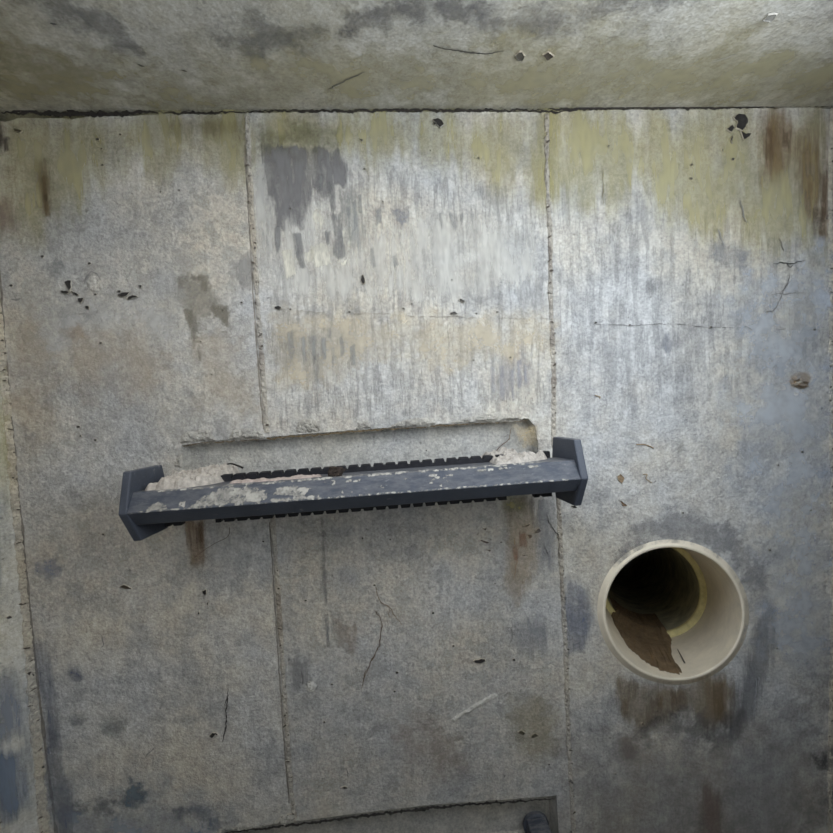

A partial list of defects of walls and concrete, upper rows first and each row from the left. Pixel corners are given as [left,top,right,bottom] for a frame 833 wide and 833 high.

crack [2,106,833,118]
damp [262,144,346,268]
damp [178,275,229,342]
crack [362,585,402,686]
rust [696,678,731,727]
damp [0,752,25,818]